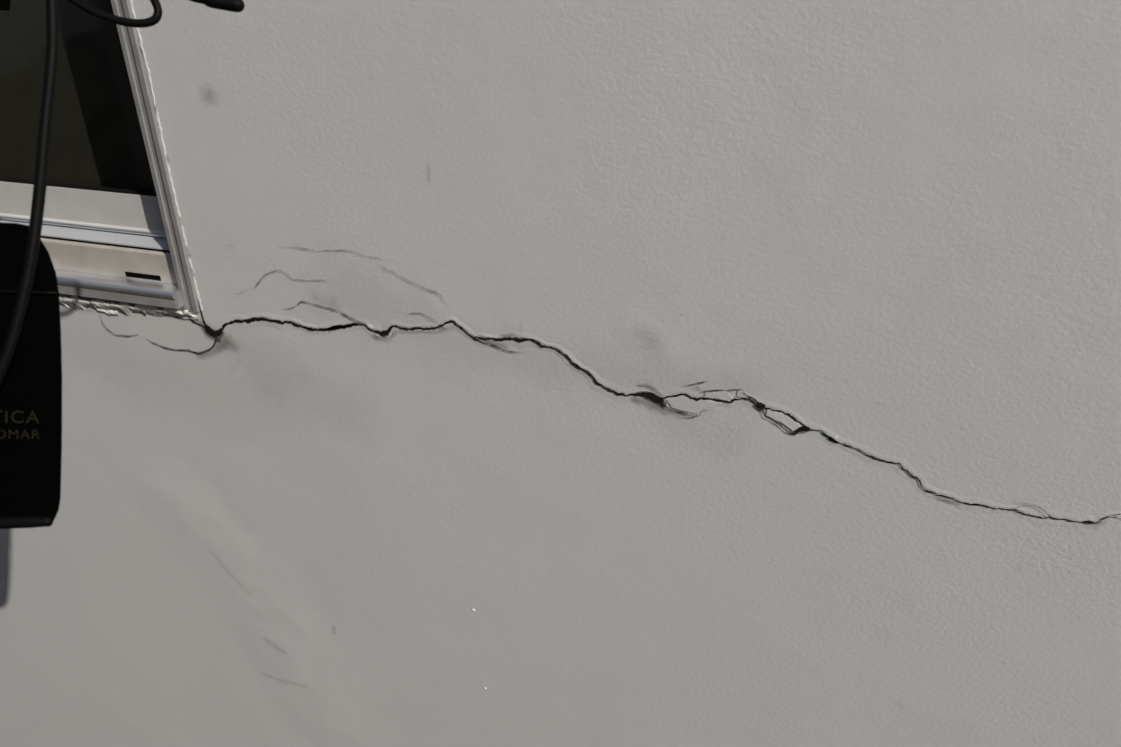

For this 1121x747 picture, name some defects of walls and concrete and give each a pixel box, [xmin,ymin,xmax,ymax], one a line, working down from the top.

crack [100,249,1121,531]